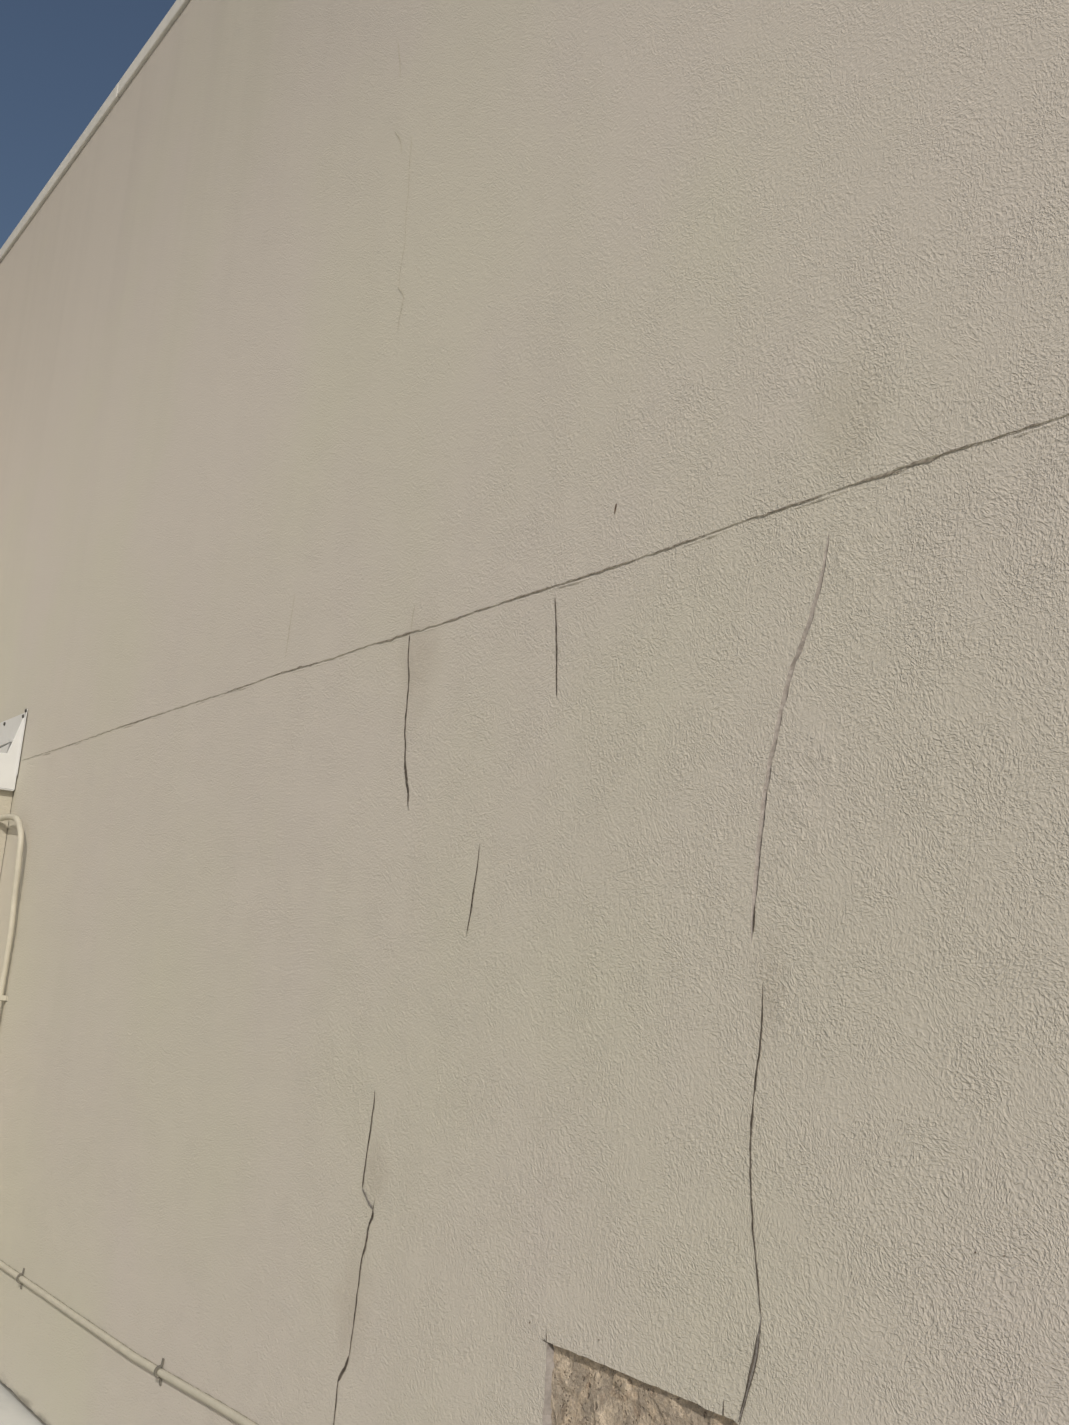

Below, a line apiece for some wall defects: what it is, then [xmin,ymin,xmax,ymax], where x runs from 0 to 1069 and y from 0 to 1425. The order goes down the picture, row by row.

crack [466,844,480,935]
crack [21,413,1069,805]
crack [751,535,829,942]
crack [333,1092,375,1425]
spalling [542,1336,738,1425]
crack [722,988,763,1425]